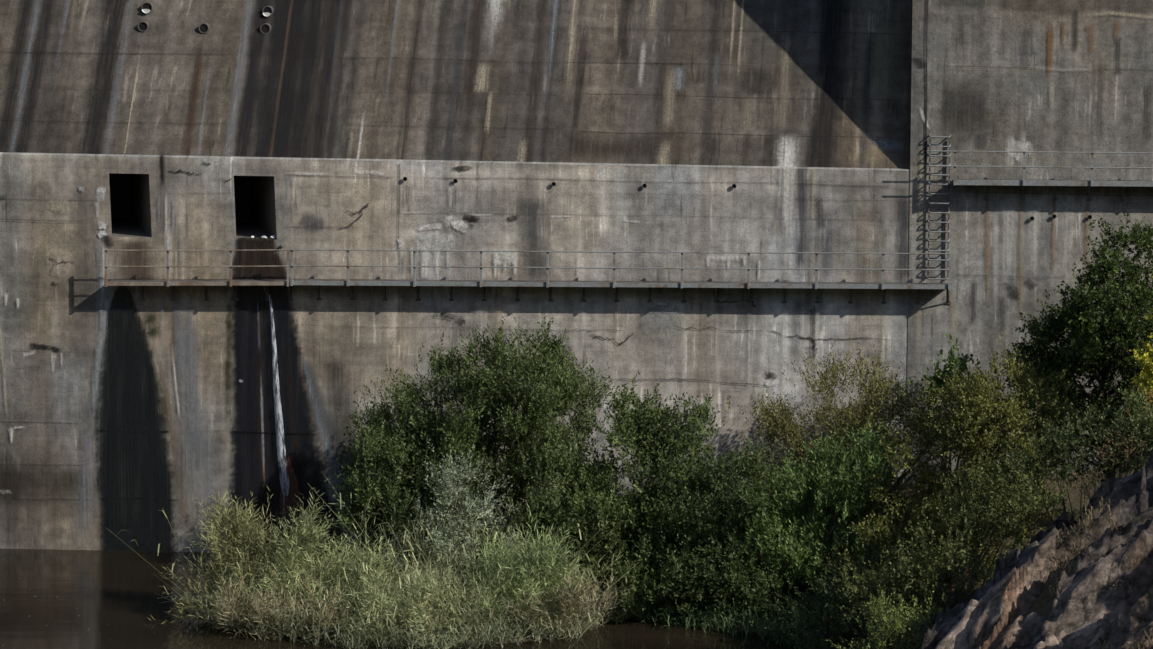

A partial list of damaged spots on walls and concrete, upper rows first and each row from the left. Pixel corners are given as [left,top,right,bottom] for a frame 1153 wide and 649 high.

water stain [0,0,52,153]
water stain [82,0,126,154]
crack [339,203,369,229]
water stain [84,236,196,552]
water stain [226,237,351,555]
crack [668,298,888,356]